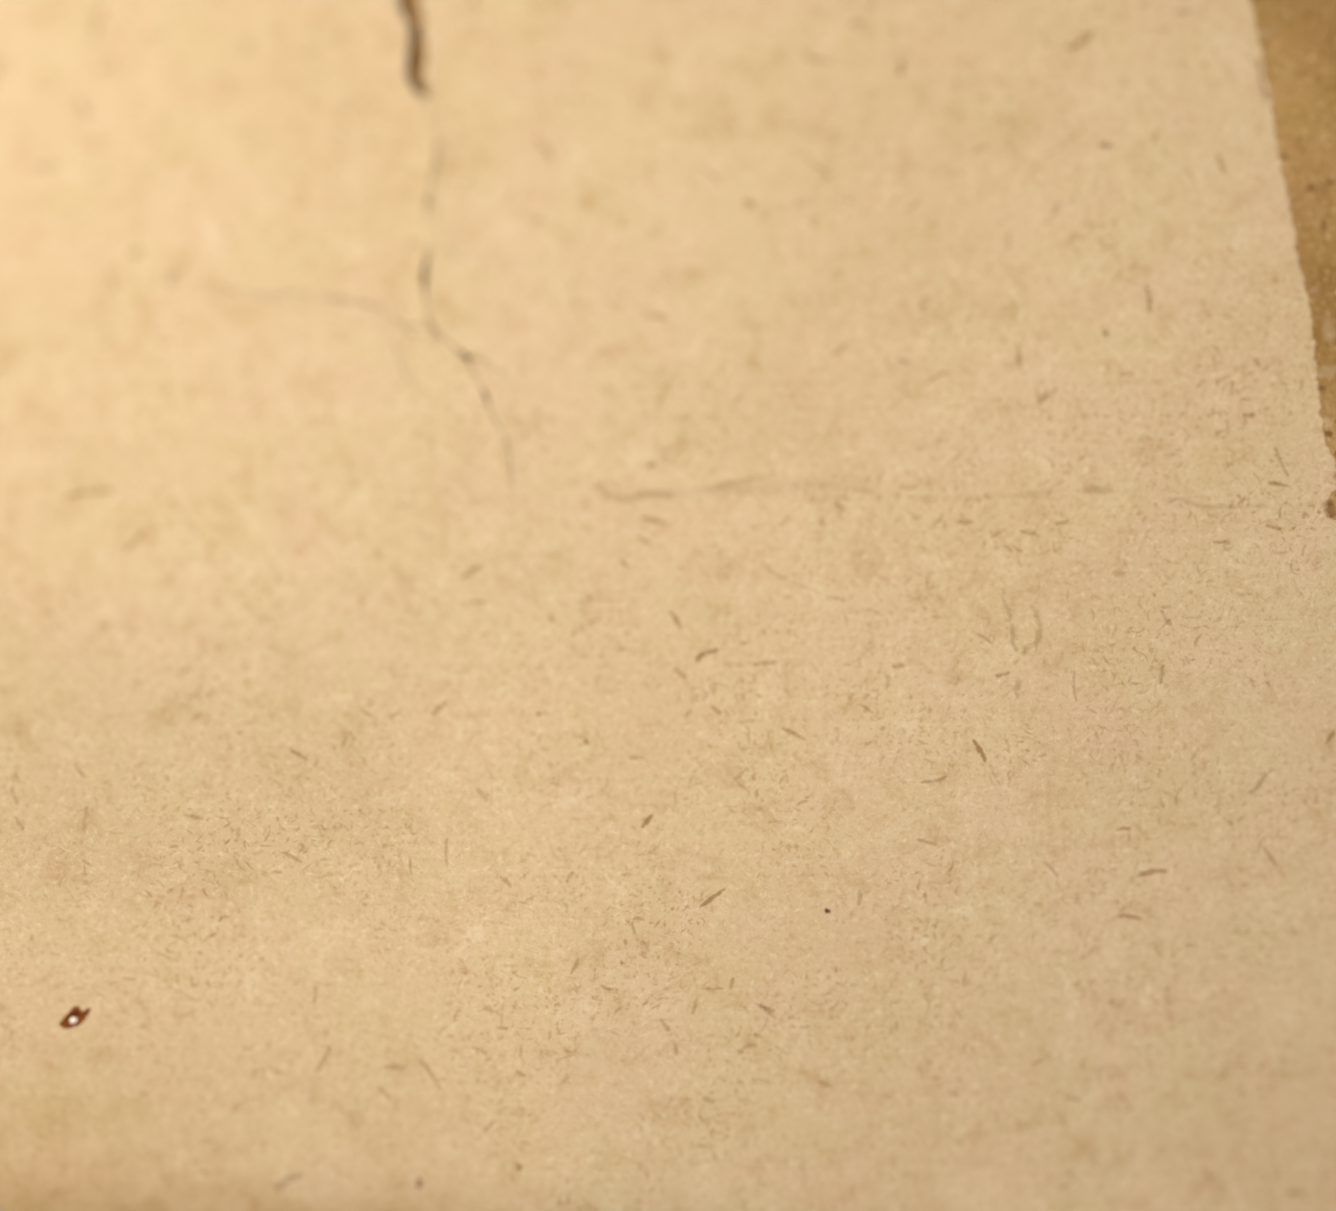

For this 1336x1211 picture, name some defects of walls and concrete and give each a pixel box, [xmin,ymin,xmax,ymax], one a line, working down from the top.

crack [394,0,433,102]